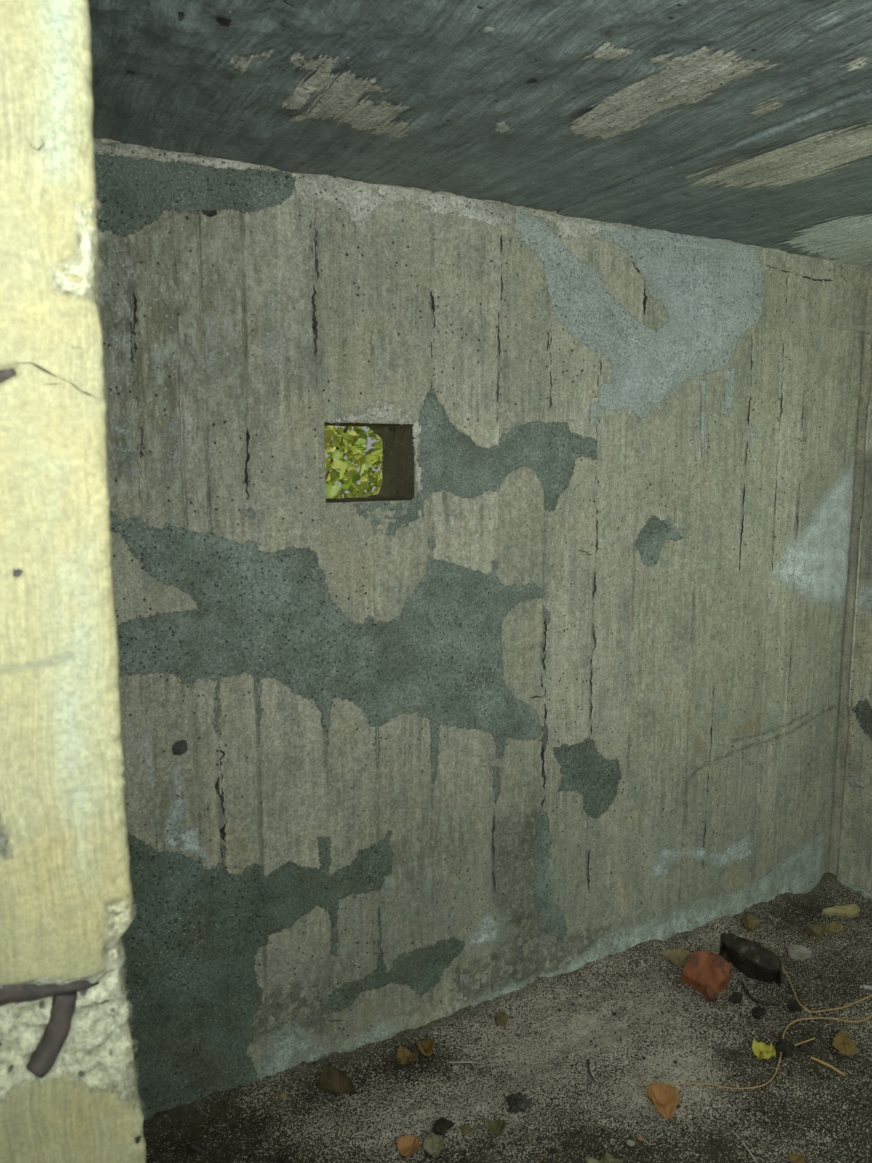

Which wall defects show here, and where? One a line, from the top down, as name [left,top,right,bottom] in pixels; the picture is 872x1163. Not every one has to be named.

peeling [229,49,275,72]
peeling [281,50,413,138]
peeling [570,42,784,140]
peeling [838,55,872,71]
peeling [674,121,872,189]
peeling [779,214,872,266]
spalling [0,899,138,1111]